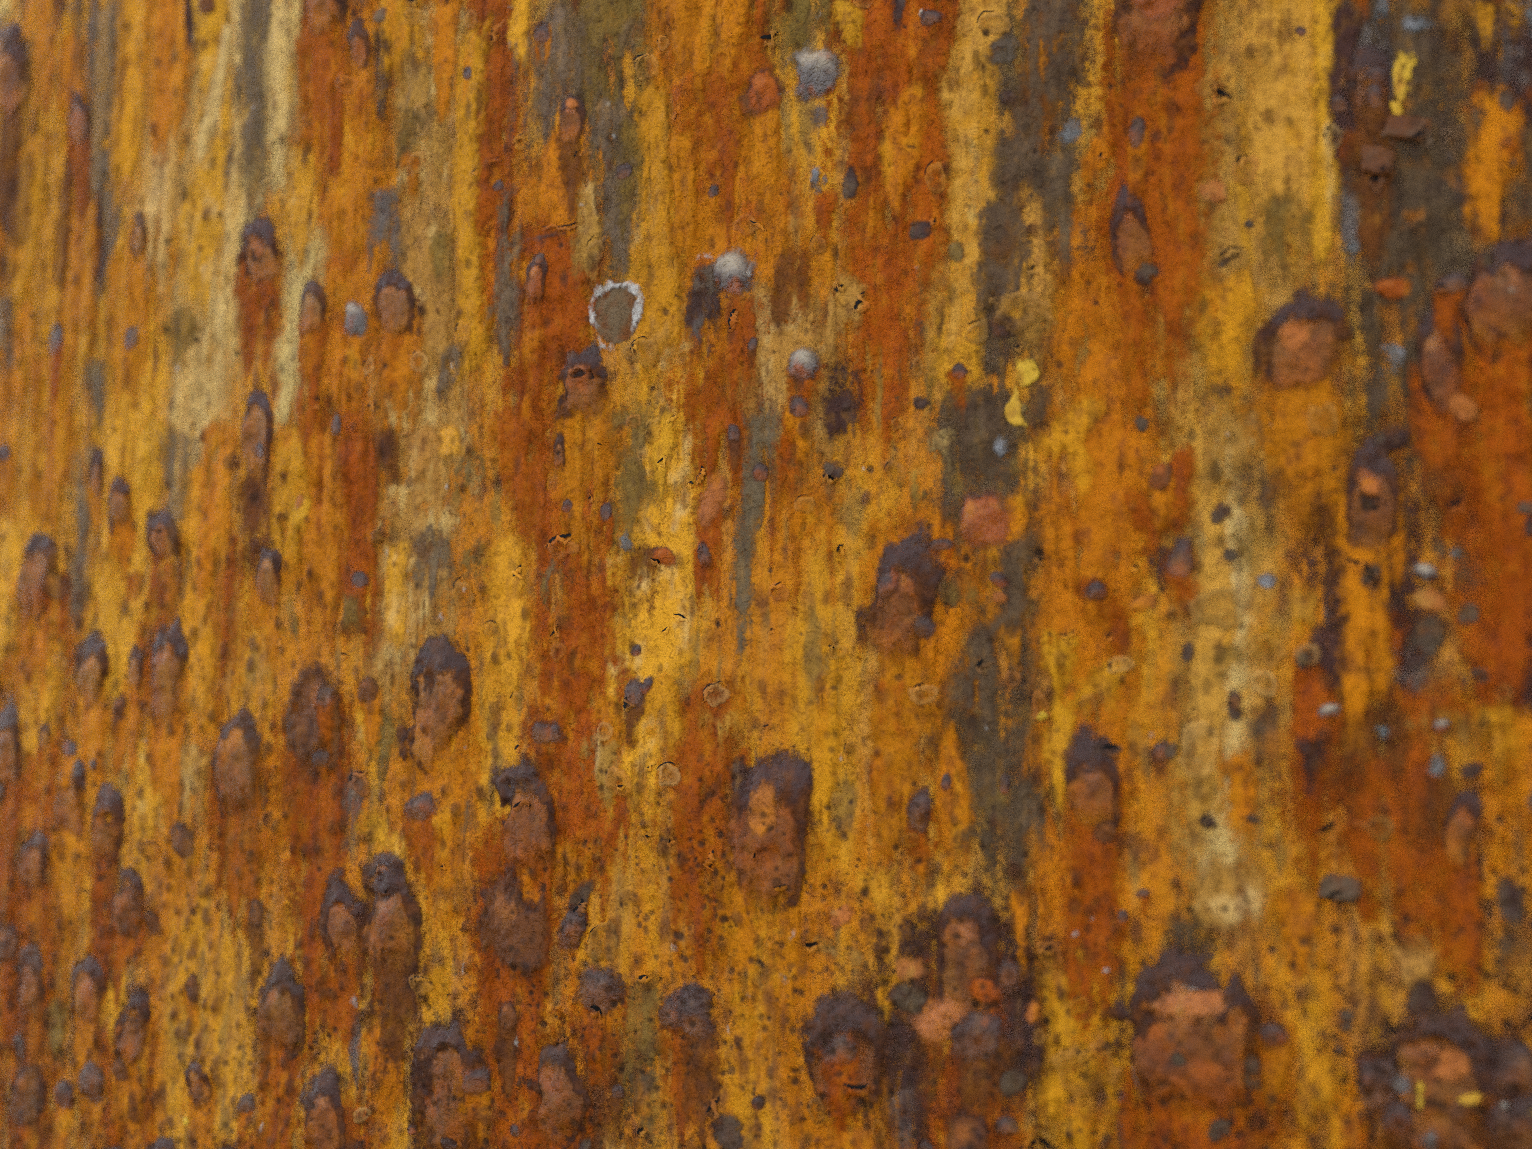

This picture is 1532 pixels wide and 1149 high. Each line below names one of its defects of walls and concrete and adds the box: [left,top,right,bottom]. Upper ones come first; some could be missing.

corrosion [0,0,646,1149]
corrosion [633,0,1532,1149]